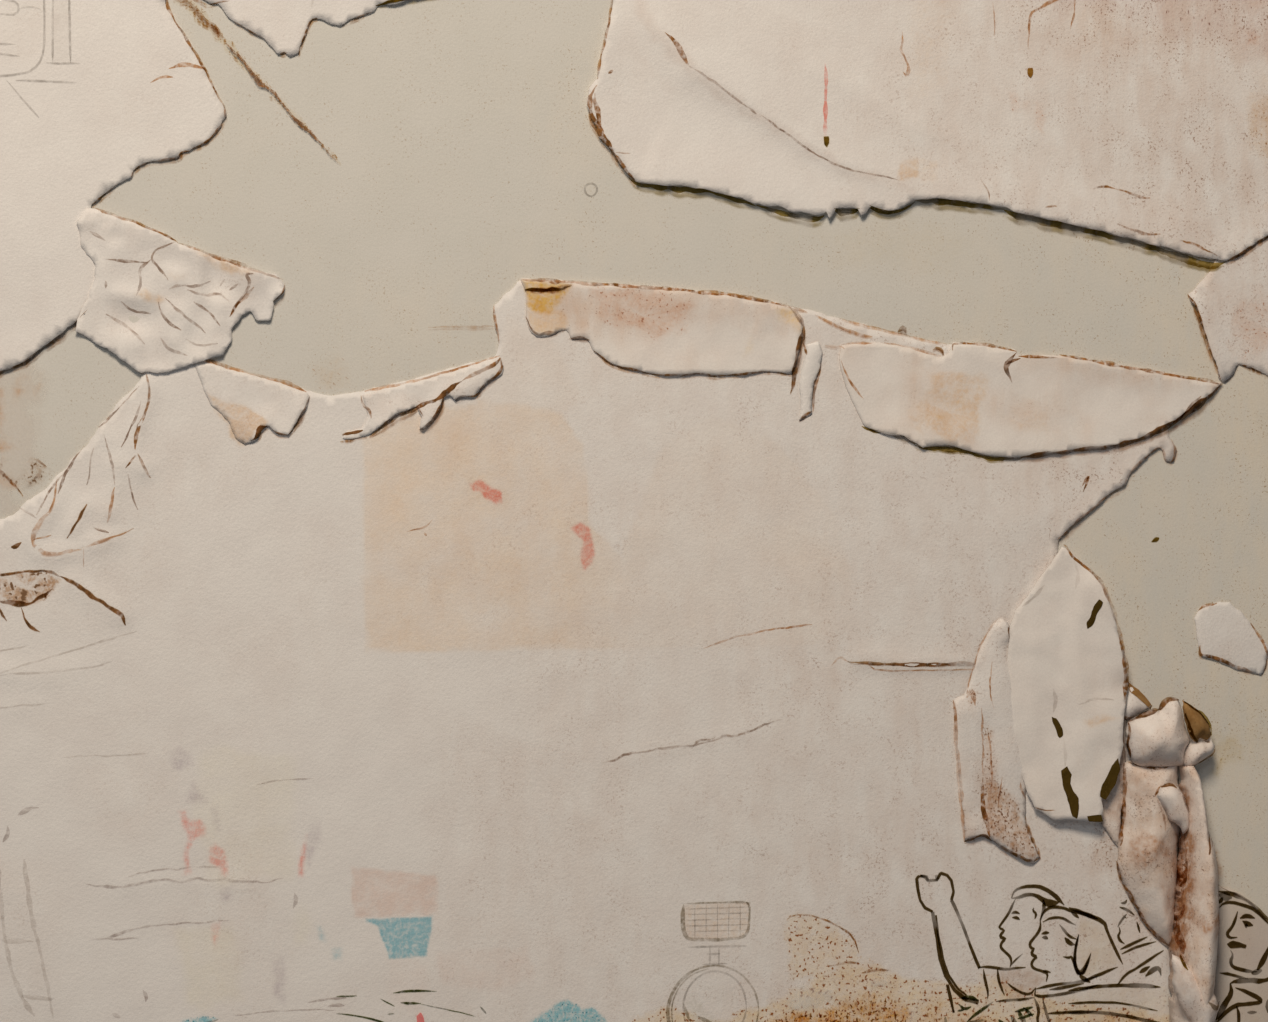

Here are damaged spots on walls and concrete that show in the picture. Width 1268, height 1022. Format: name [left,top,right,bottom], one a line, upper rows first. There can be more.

crack [180,1,338,163]
flaking render [0,363,42,513]
peeling [75,208,309,445]
peeling [520,278,823,421]
peeling [839,329,1223,462]
flaking render [4,572,47,601]
peeling [1194,602,1268,675]